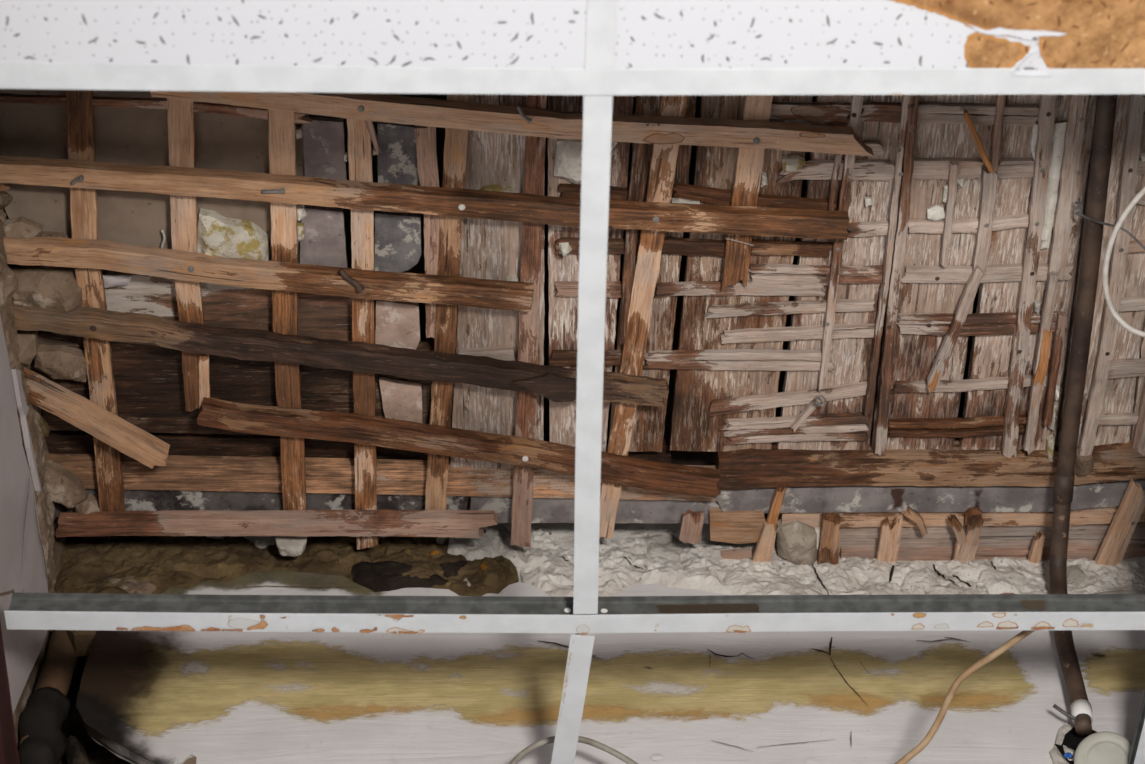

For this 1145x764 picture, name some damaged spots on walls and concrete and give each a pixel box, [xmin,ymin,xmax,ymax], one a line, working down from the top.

spalling [0,191,574,597]
spalling [598,519,1050,597]
spalling [1067,556,1145,594]
corrosion [116,615,268,632]
corrosion [359,614,425,634]
corrosion [977,600,1093,630]
damp [79,630,568,736]
crack [707,649,755,660]
damp [582,643,1037,722]
crack [814,637,870,706]
damp [1080,648,1145,694]
crack [715,731,852,752]